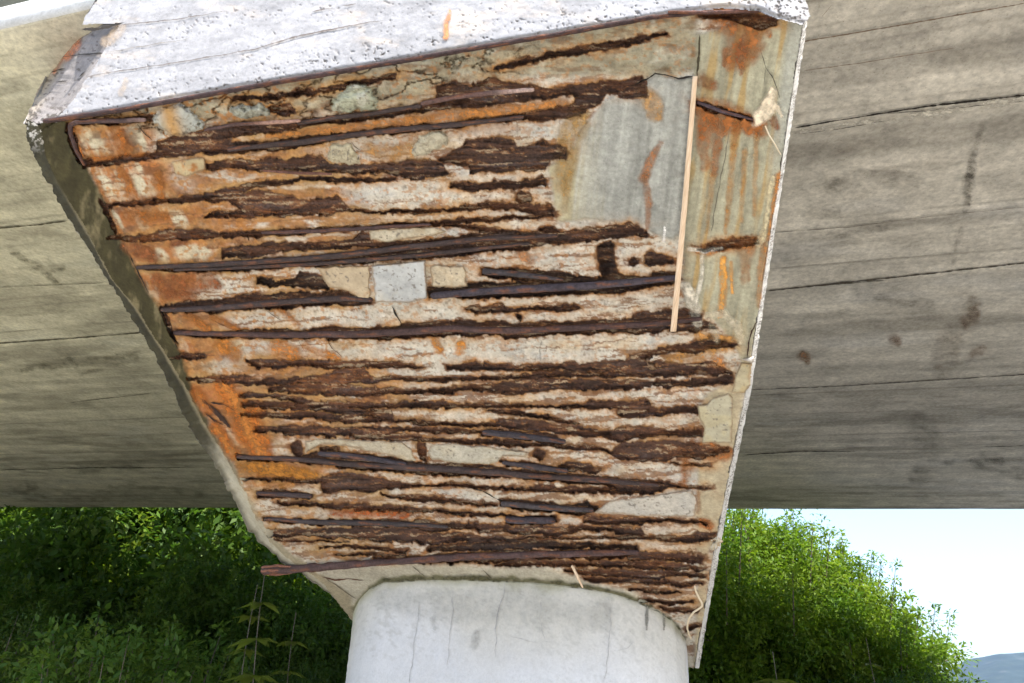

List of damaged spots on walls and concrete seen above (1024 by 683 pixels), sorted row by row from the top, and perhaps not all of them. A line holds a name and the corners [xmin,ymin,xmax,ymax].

crack [636,35,700,84]
spalling [698,13,777,30]
corrosion [710,8,772,76]
corrosion [266,100,568,139]
corrosion [79,126,221,301]
corrosion [639,142,663,230]
corrosion [695,76,781,318]
spalling [23,24,759,632]
corrosion [432,339,466,356]
corrosion [666,332,734,369]
corrosion [191,382,318,488]
corrosion [332,509,410,519]